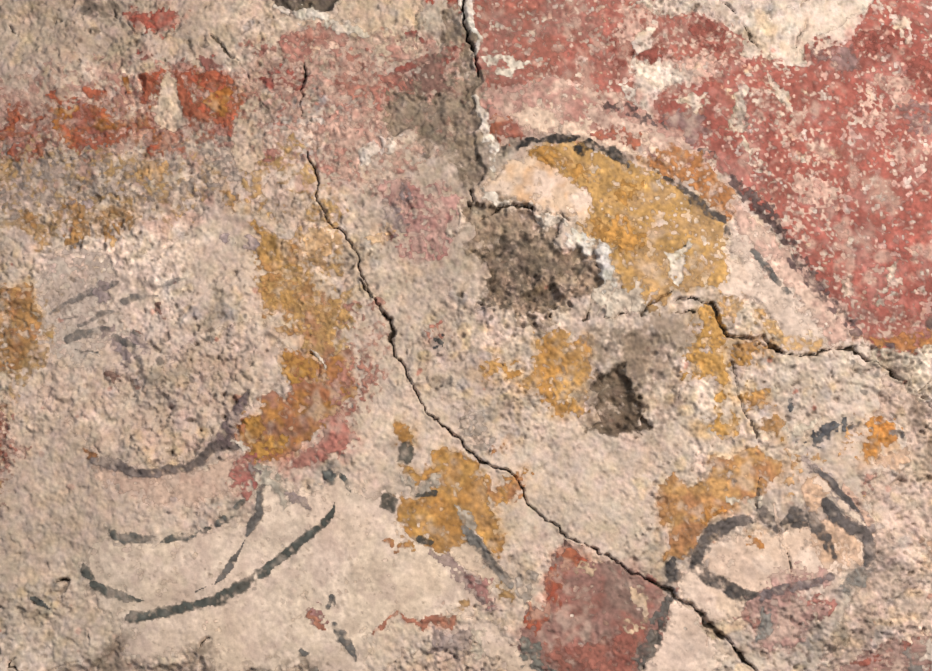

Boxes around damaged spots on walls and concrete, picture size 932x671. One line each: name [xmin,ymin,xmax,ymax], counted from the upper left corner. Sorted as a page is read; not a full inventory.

crack [460,1,479,76]
spalling [382,9,488,187]
crack [495,204,533,213]
spalling [461,191,607,335]
crack [334,228,530,506]
spalling [585,361,653,439]
crack [621,292,747,340]
crack [731,361,758,439]
crack [775,346,866,362]
crack [546,521,755,669]